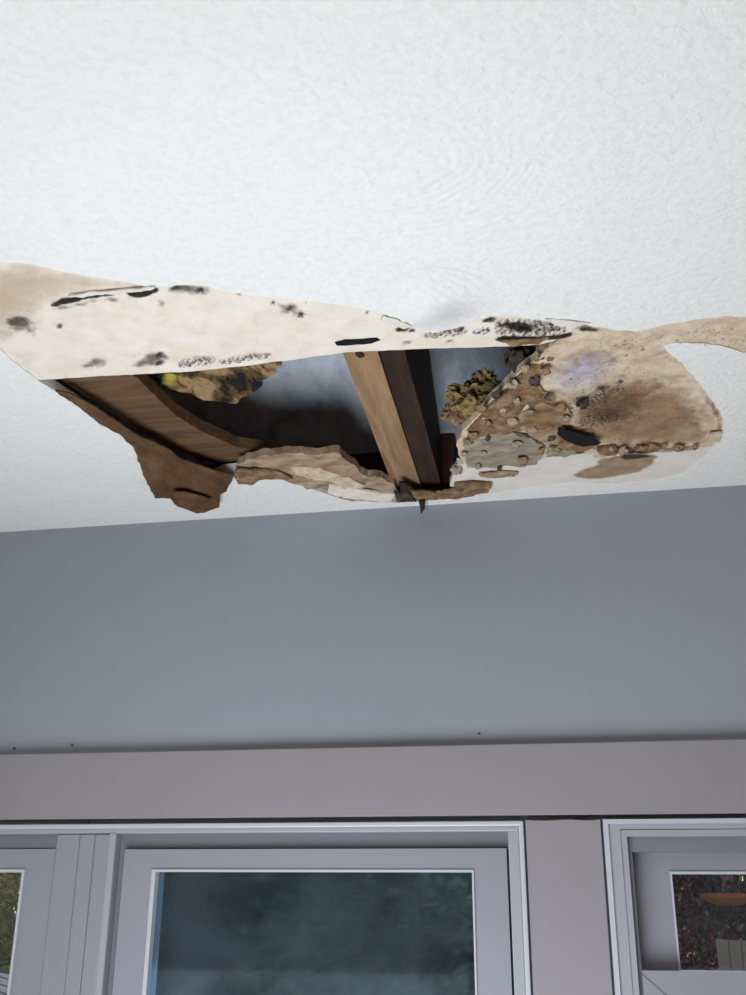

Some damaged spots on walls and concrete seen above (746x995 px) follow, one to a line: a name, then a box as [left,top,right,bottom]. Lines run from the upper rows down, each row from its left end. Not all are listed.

peeling [0,263,746,502]